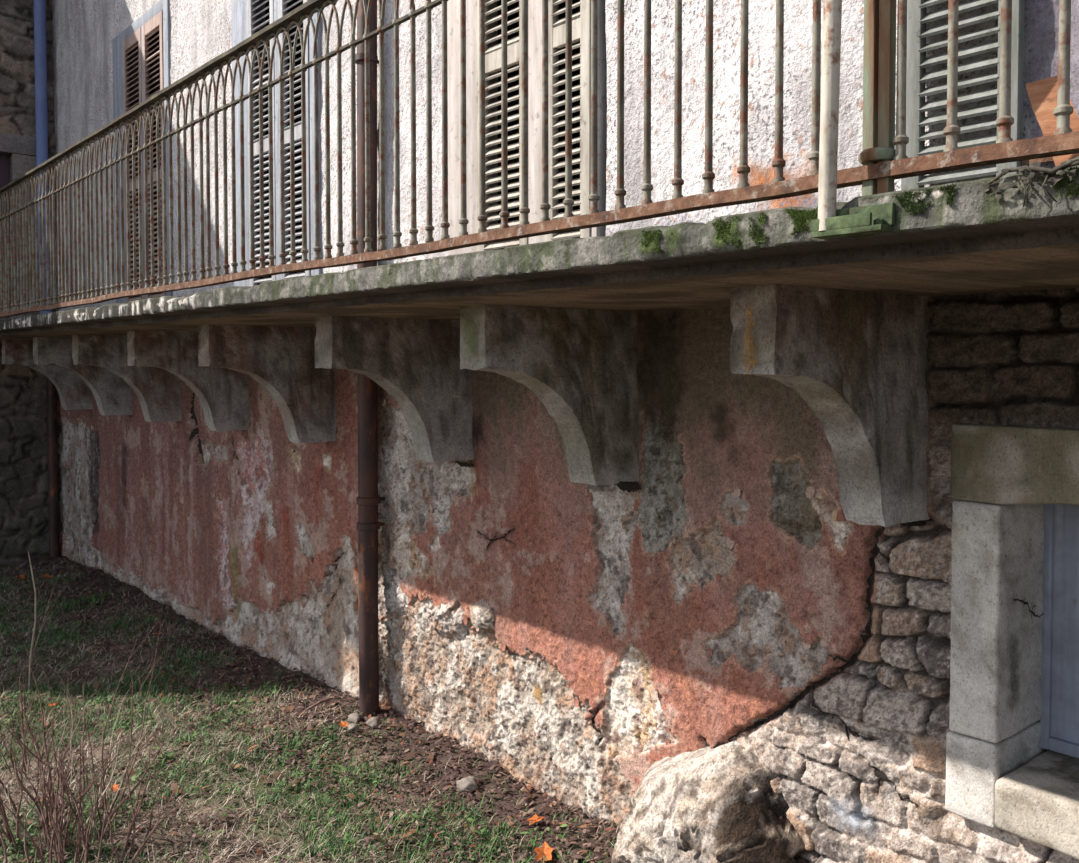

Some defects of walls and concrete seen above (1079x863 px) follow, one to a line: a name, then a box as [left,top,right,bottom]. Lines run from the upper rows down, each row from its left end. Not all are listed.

rust [733,158,802,186]
rust [771,194,810,208]
peeling [59,421,359,699]
crack [478,529,514,548]
peeling [378,399,677,828]
peeling [587,420,750,635]
peeling [707,585,833,686]
peeling [770,461,849,550]
crack [703,518,933,808]
crack [1014,599,1045,622]